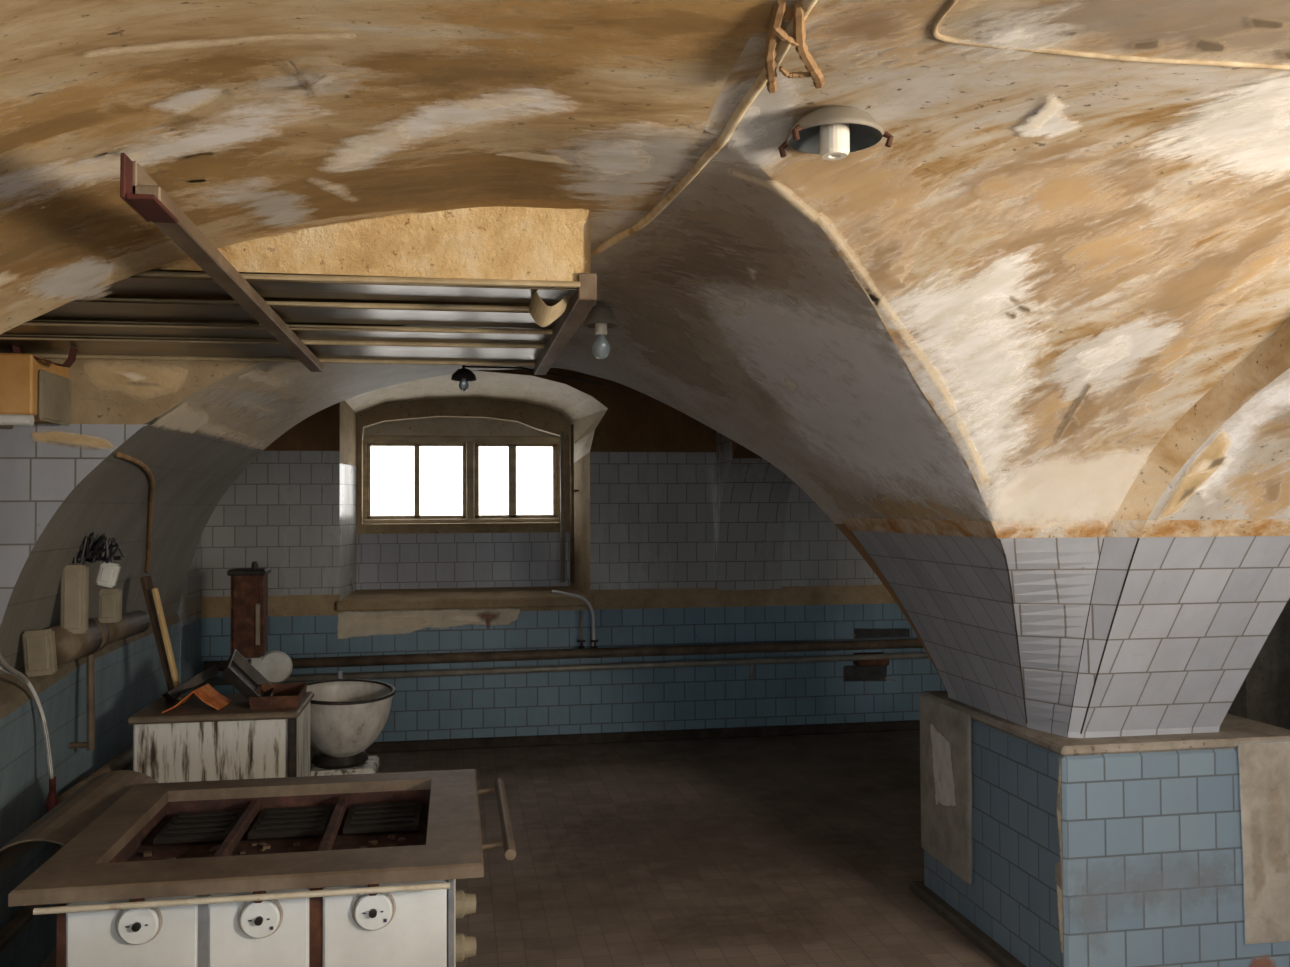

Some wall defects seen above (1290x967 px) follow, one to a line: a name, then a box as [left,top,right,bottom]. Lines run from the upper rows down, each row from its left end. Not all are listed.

peeling [0,67,356,202]
flaking render [1017,98,1078,136]
flaking render [1147,77,1290,179]
peeling [206,179,313,227]
peeling [29,258,114,300]
flaking render [877,254,1179,522]
spalling [1163,385,1290,517]
peeling [337,609,520,639]
peeling [930,724,956,807]
corrosion [1250,956,1275,967]